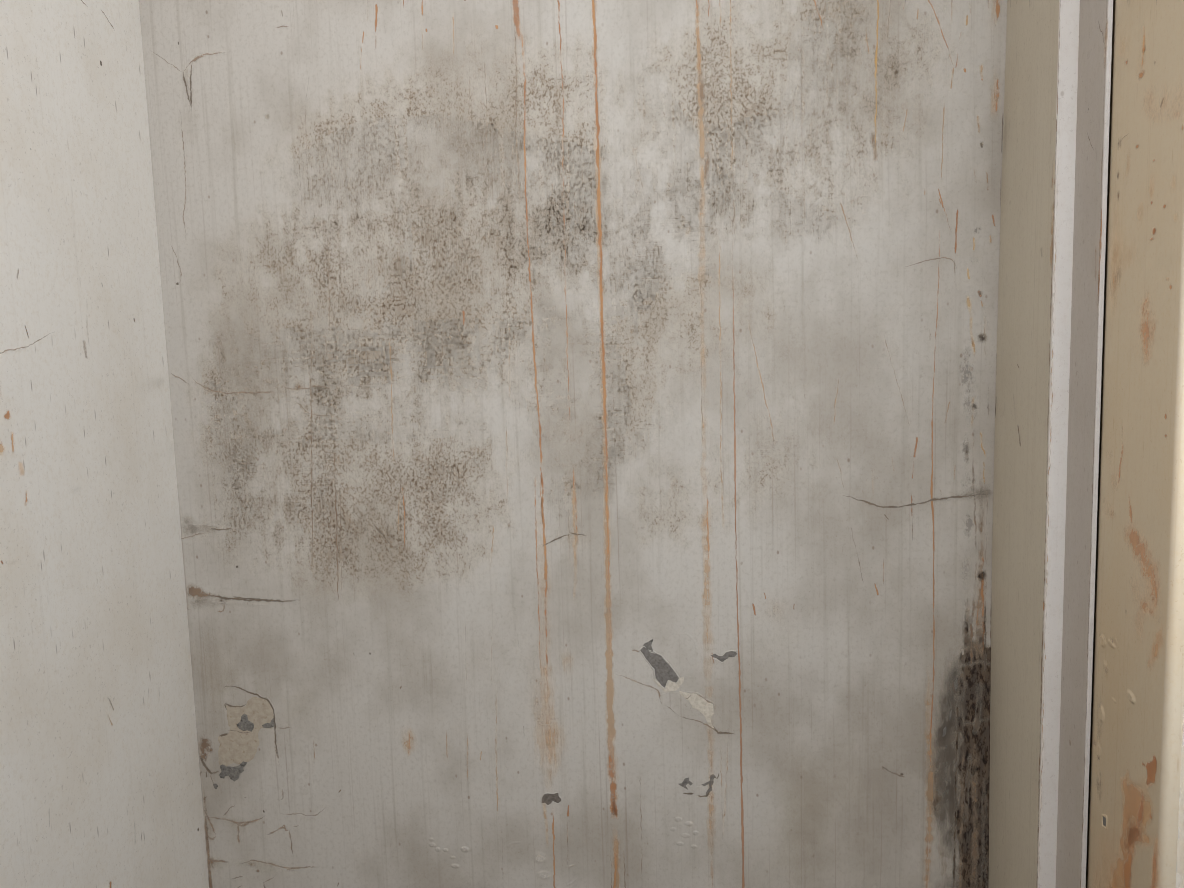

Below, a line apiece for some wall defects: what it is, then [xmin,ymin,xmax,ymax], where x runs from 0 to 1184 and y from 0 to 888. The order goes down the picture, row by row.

crack [156,42,217,105]
mould [637,0,865,238]
mould [203,56,621,589]
corrosion [515,67,548,663]
corrosion [592,0,617,817]
crack [843,490,989,508]
crack [189,586,293,612]
spalling [200,686,284,789]
spalling [540,792,563,806]
spalling [633,632,738,734]
leakage [929,550,991,888]
corrosion [1113,757,1157,888]